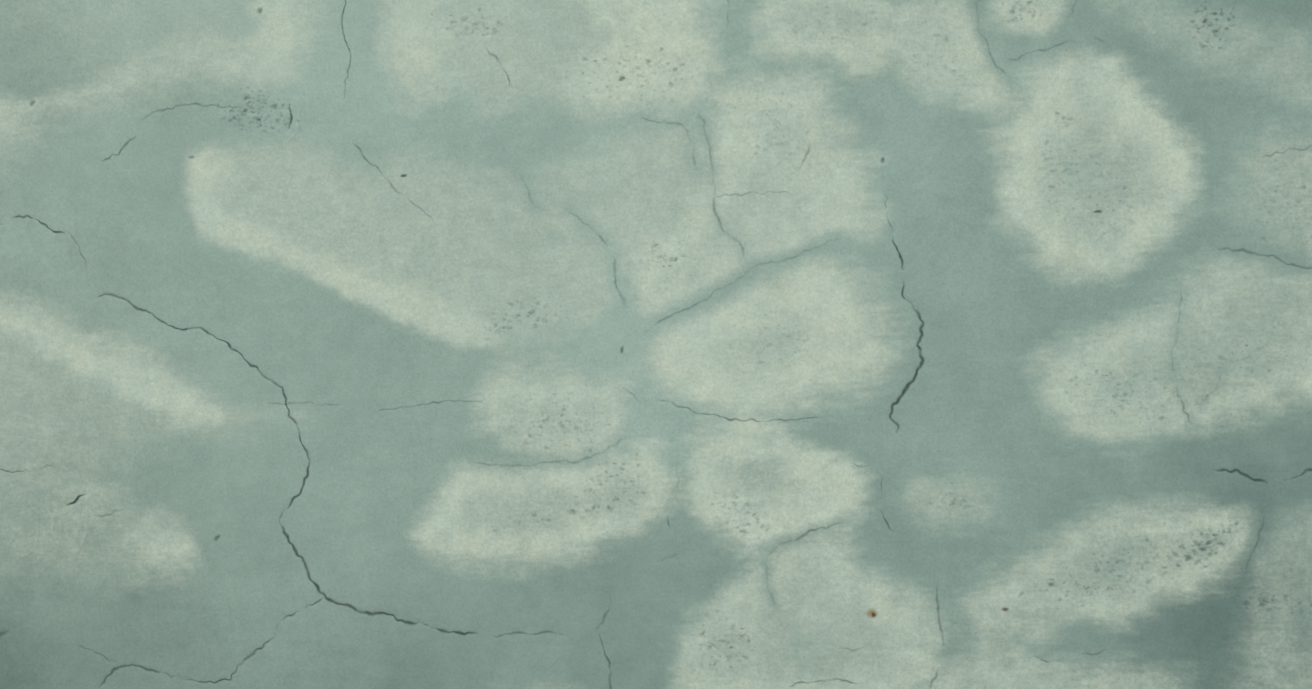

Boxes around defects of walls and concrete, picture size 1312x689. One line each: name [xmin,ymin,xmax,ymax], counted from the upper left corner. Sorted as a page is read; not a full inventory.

crack [283,391,469,635]
damp [176,0,734,593]
crack [890,242,924,418]
damp [607,0,1312,689]